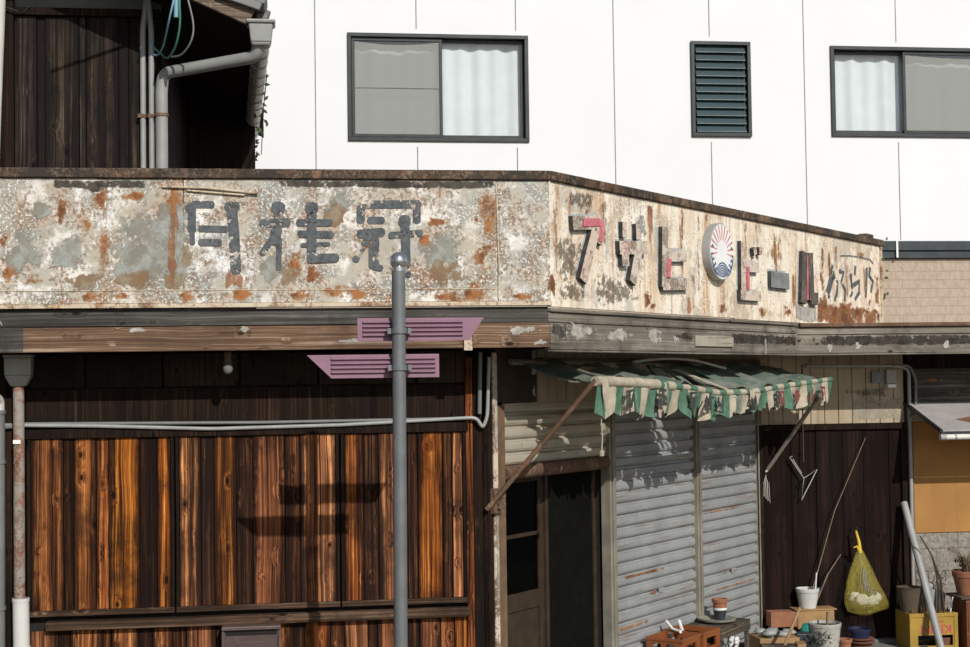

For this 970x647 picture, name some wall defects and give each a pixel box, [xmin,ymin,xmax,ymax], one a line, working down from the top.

peeling [5,201,101,290]
peeling [109,201,194,290]
rust [166,188,182,283]
rust [225,269,252,301]
rust [418,217,450,246]
rust [434,194,497,302]
peeling [555,237,585,301]
peeling [570,190,592,213]
peeling [595,274,638,305]
rust [784,275,796,315]
rust [799,247,970,327]
peeling [566,323,633,341]